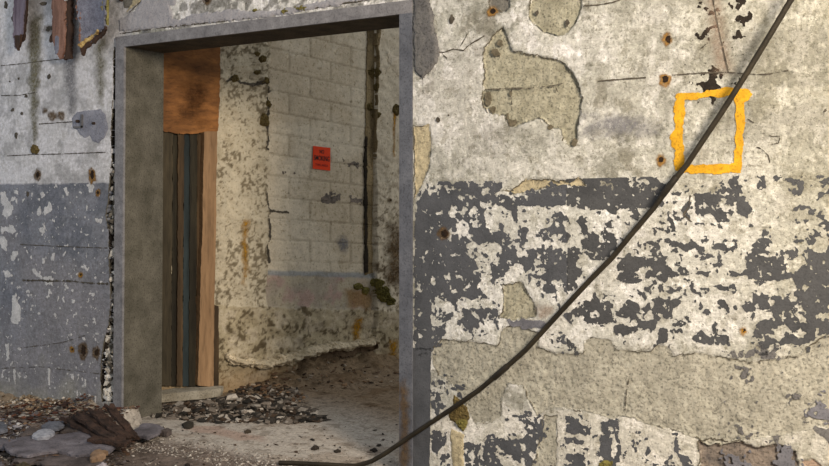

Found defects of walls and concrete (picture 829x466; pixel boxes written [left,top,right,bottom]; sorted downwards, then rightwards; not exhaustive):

crack [439,34,484,59]
spalling [528,0,582,37]
water stain [29,16,74,141]
spalling [481,27,584,147]
rust [659,74,672,88]
peeling [0,47,116,403]
water stain [387,226,399,286]
spalling [413,114,829,466]
rust [70,342,100,360]